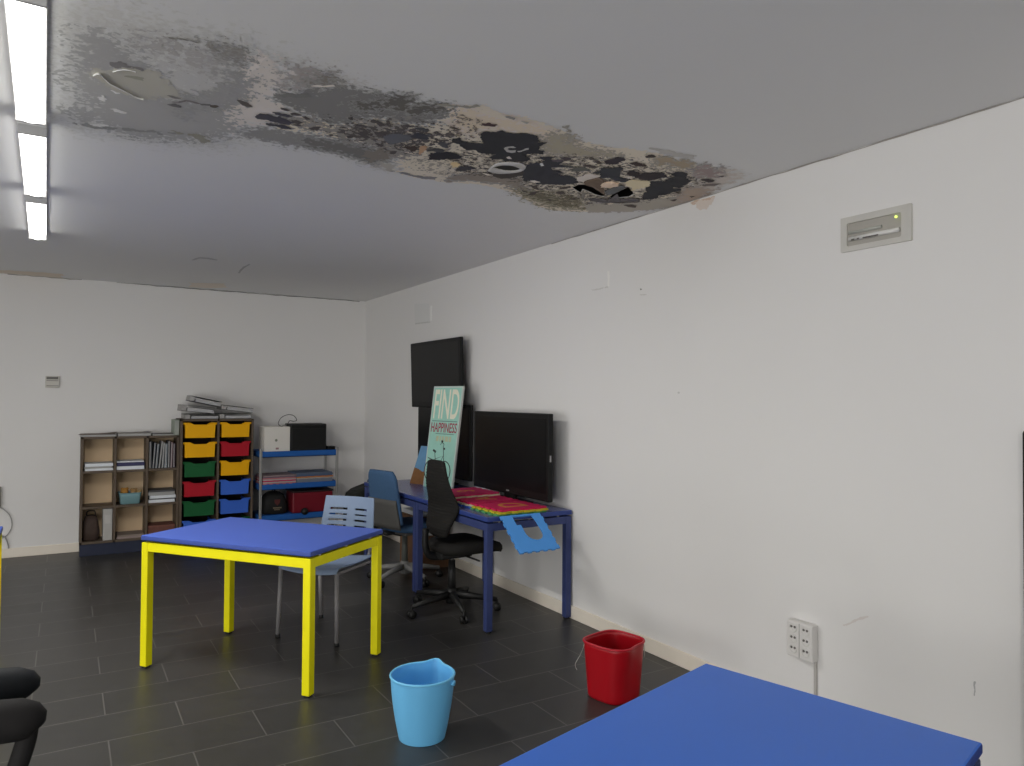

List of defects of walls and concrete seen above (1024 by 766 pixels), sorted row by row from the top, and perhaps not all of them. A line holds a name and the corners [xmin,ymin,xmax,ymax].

peeling [87,66,187,114]
leakage [47,0,752,213]
peeling [277,104,714,213]